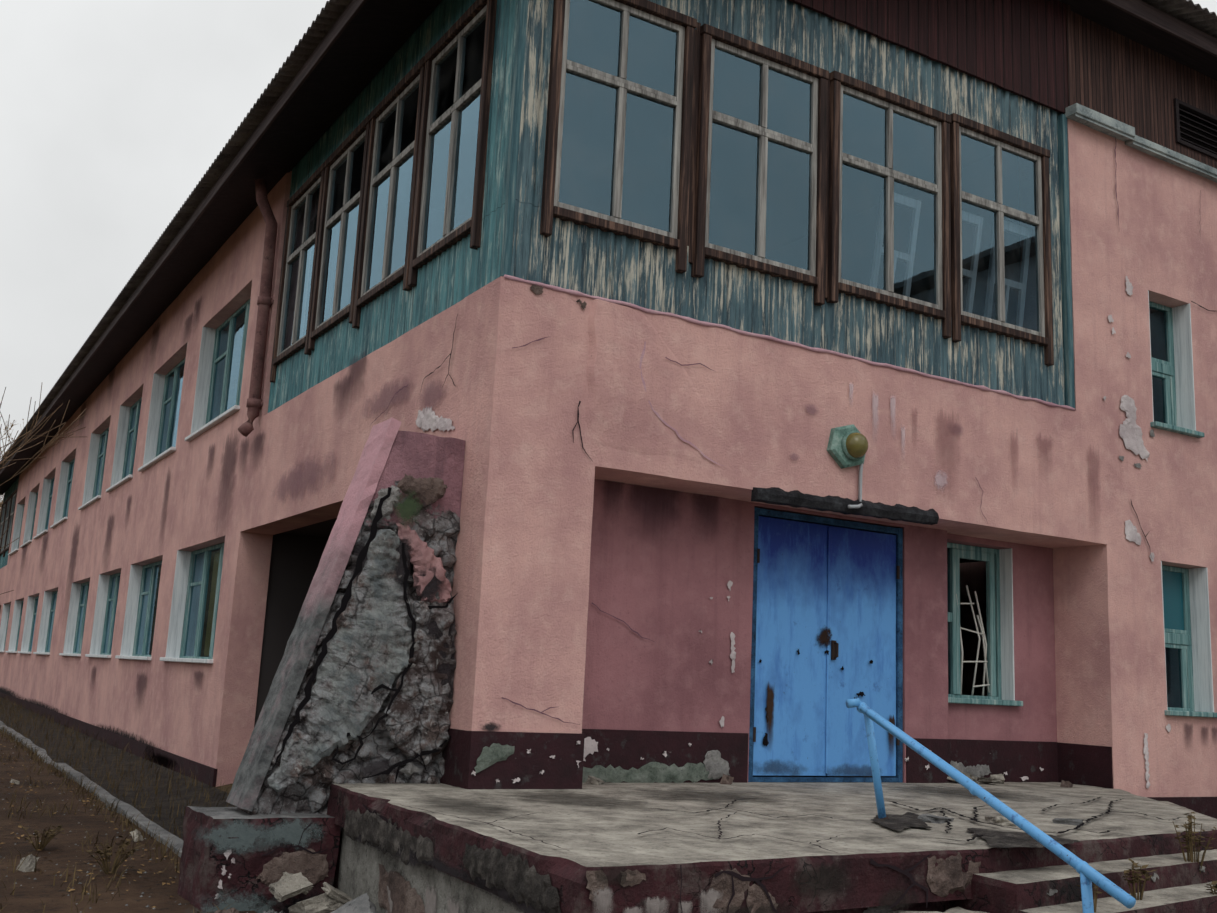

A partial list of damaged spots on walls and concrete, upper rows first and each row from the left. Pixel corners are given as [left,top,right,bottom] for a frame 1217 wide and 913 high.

spalling [416,406,455,432]
crack [572,400,591,459]
spalling [1119,395,1155,469]
spalling [267,474,457,793]
rust [817,627,832,646]
spalling [471,743,531,783]
spalling [576,737,730,783]
peeling [215,849,235,899]
spalling [256,848,329,886]
spalling [586,869,646,902]
spalling [709,868,778,913]